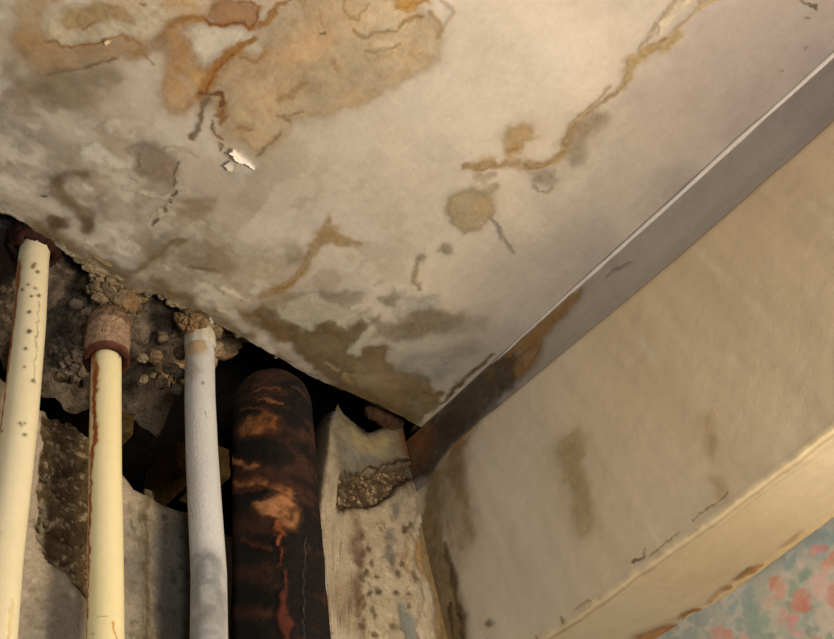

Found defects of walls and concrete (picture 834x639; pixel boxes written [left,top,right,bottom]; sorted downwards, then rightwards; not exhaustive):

damp [0,0,170,109]
damp [50,171,94,234]
damp [77,118,199,216]
peeling [224,149,256,177]
damp [446,0,717,253]
corrosion [506,291,581,376]
spalling [0,210,436,599]
damp [133,218,518,639]
peeling [351,530,382,637]
peeling [388,513,431,639]